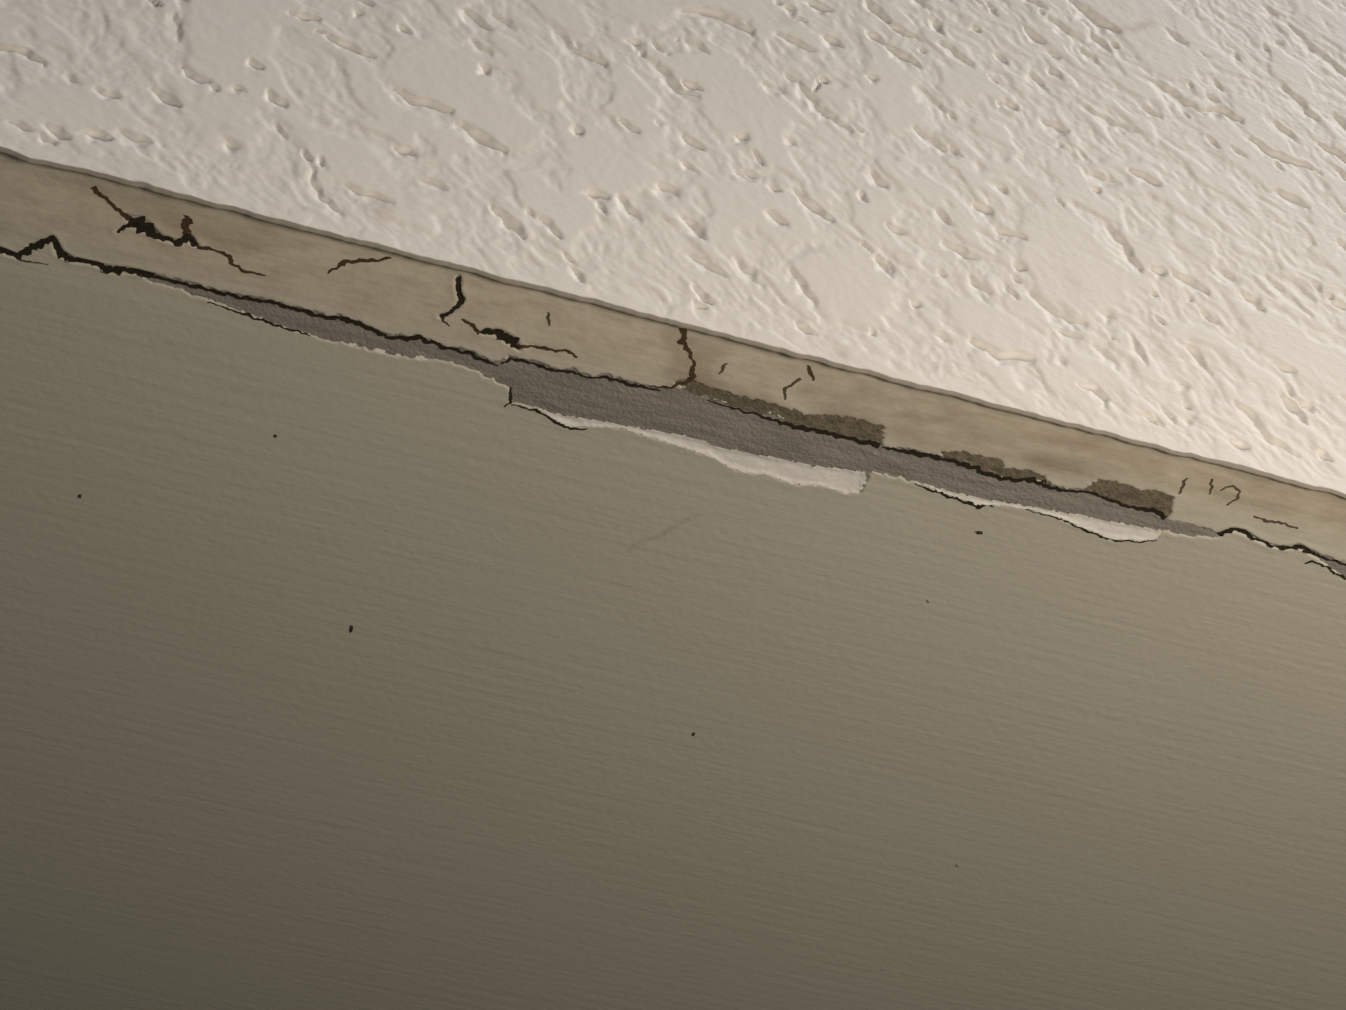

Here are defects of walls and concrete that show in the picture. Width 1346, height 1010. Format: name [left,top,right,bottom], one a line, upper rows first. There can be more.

crack [0,236,156,276]
crack [90,186,266,276]
crack [328,256,391,274]
crack [440,276,578,358]
peeling [137,271,1222,543]
crack [650,328,728,389]
crack [783,365,815,400]
crack [1178,478,1317,554]
peeling [1302,549,1346,580]